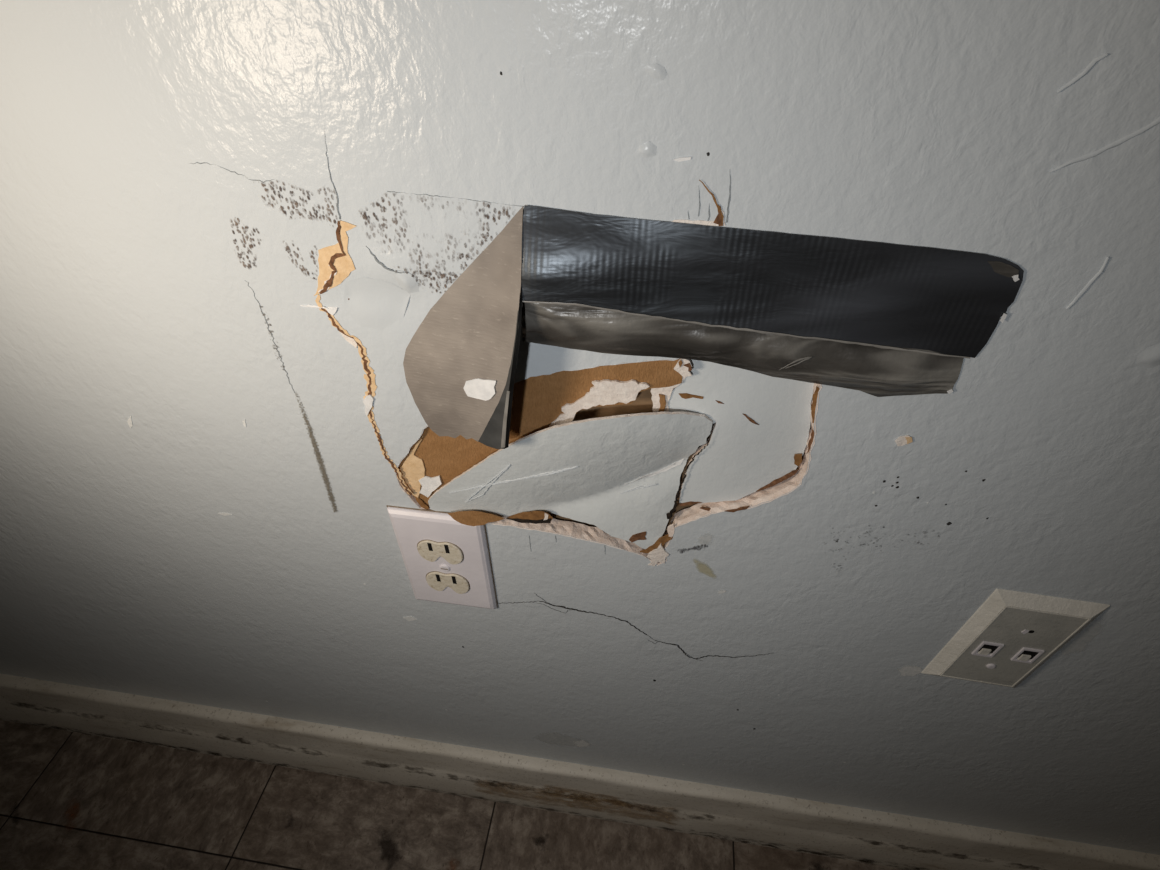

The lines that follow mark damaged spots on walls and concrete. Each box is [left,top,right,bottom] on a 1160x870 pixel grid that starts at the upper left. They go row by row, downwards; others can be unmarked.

peeling [314,220,356,296]
spalling [395,358,692,511]
spalling [448,383,822,566]
crack [498,596,765,661]